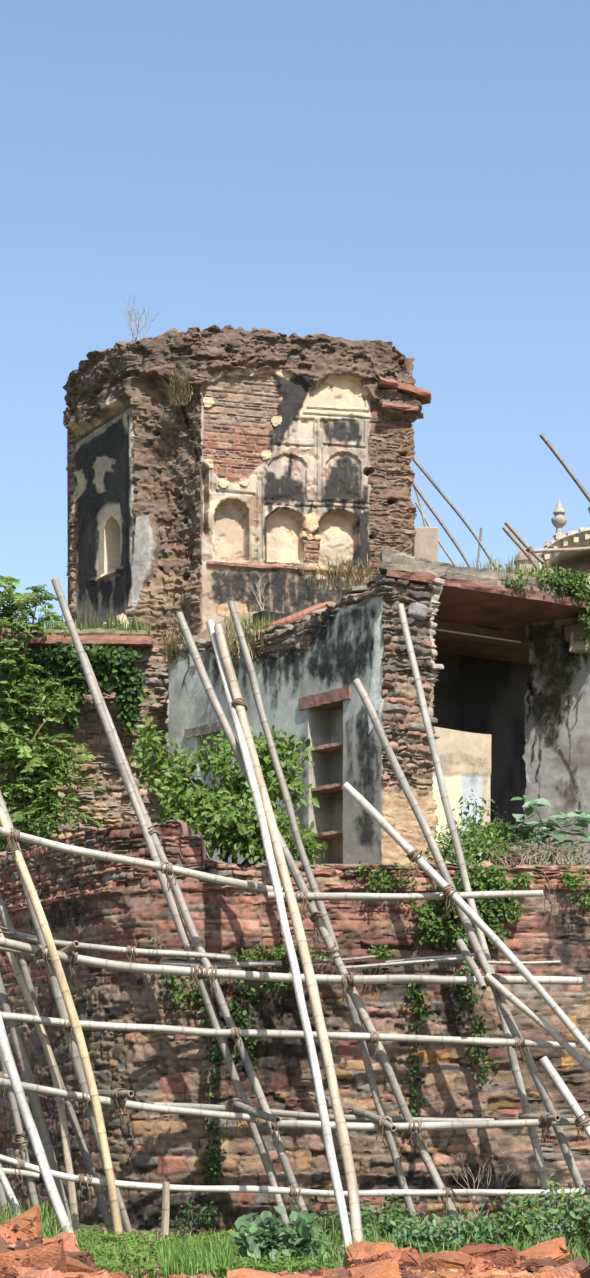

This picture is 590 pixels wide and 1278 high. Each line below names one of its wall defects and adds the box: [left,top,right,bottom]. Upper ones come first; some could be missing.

peeling [73,456,115,501]
spalling [104,370,282,677]
water stain [211,375,376,706]
water stain [528,621,588,749]
water stain [346,706,380,844]